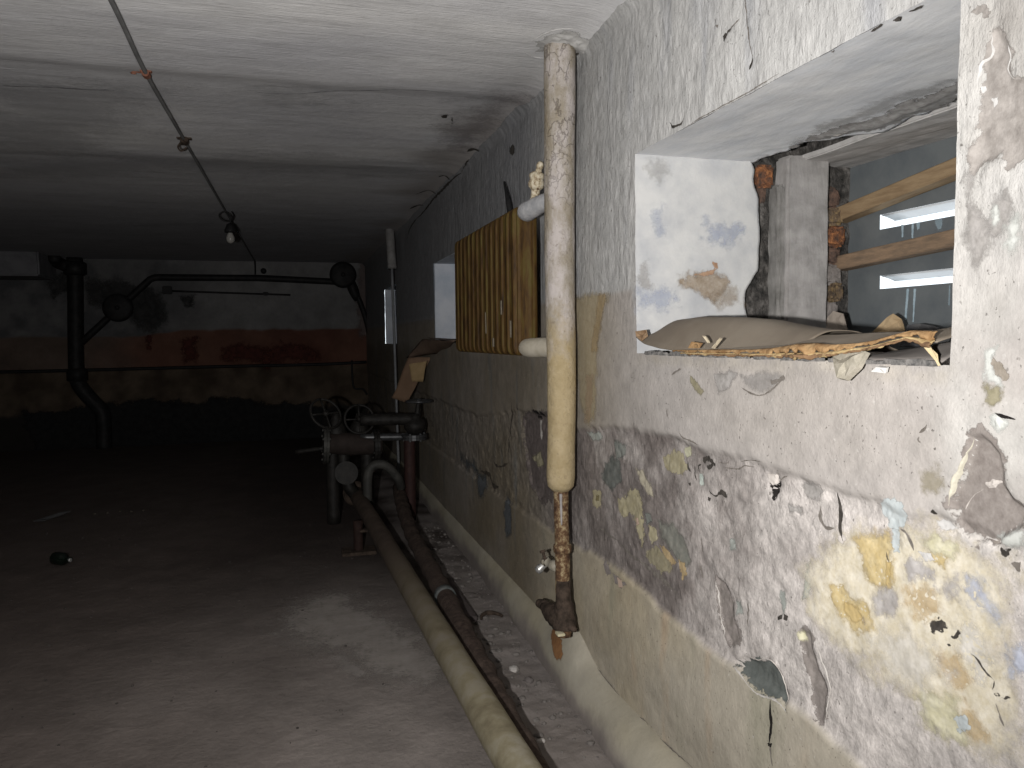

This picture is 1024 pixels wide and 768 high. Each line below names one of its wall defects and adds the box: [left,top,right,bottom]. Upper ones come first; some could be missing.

spalling [966,4,1024,175]
spalling [522,406,553,505]
peeling [618,469,687,580]
peeling [663,446,727,501]
spalling [768,473,787,501]
peeling [788,413,1024,752]
corrosion [551,629,563,660]
spalling [700,566,789,712]